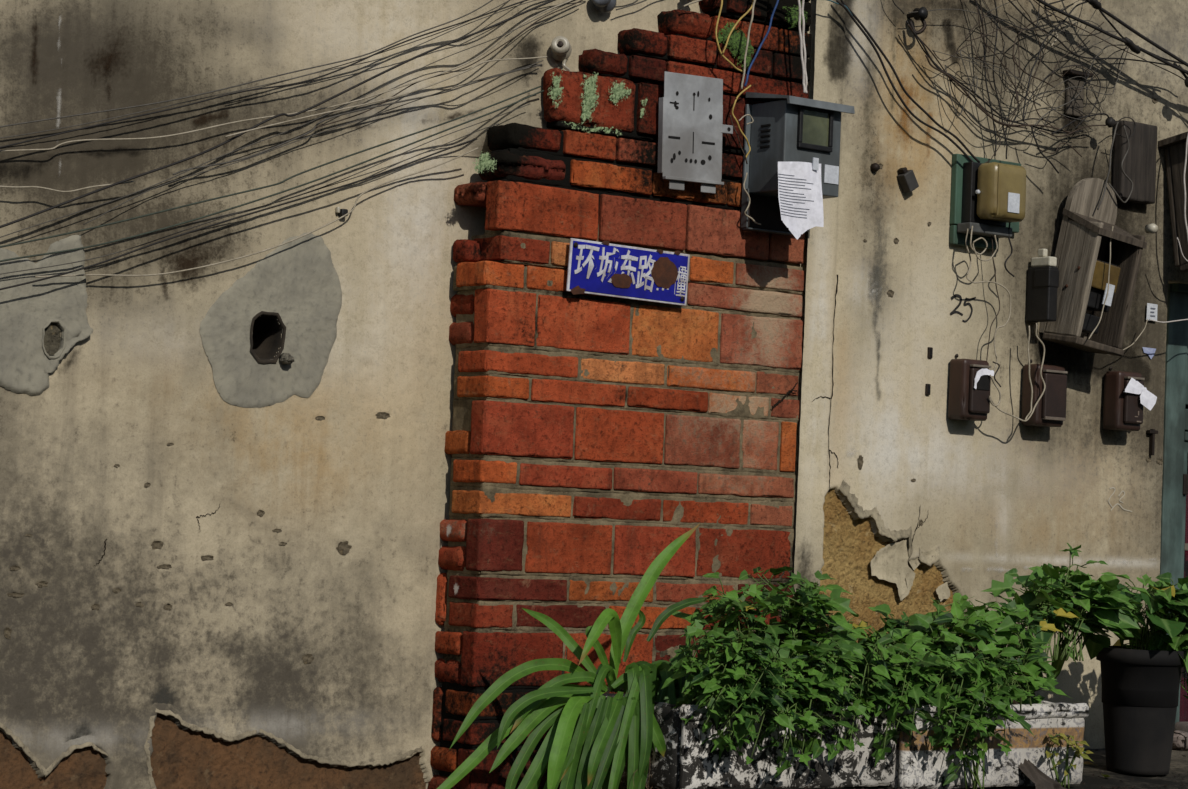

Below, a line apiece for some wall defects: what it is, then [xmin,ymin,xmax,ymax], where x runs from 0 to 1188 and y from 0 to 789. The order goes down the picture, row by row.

damp [161,249,221,292]
flaking render [817,480,954,643]
damp [153,687,175,705]
flaking render [0,723,109,789]
flaking render [144,708,426,789]